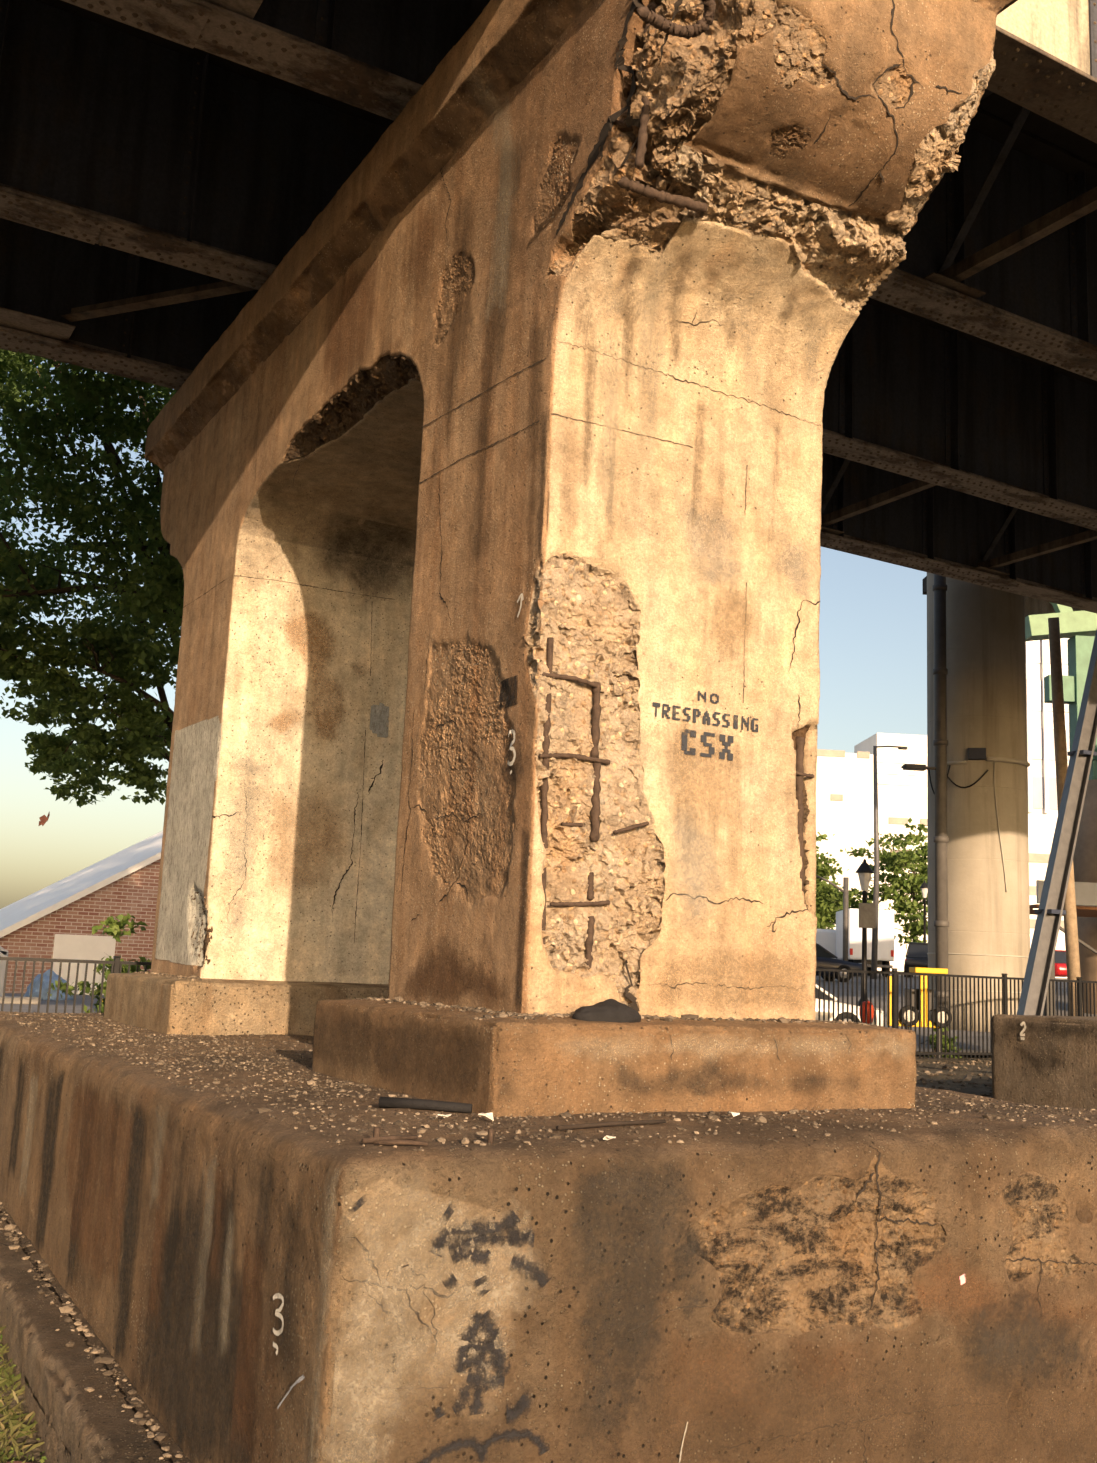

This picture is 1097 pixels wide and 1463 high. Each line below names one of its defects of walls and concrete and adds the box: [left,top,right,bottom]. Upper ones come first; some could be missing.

spalling [533,0,996,311]
crack [814,0,962,206]
spalling [418,639,516,905]
spalling [523,553,666,1013]
crack [666,893,808,932]
spalling [792,724,814,909]
water stain [8,1065,63,1249]
water stain [108,1106,162,1355]
water stain [141,1182,260,1463]
water stain [279,1216,299,1358]
water stain [572,1165,704,1425]
spalling [687,1156,947,1336]